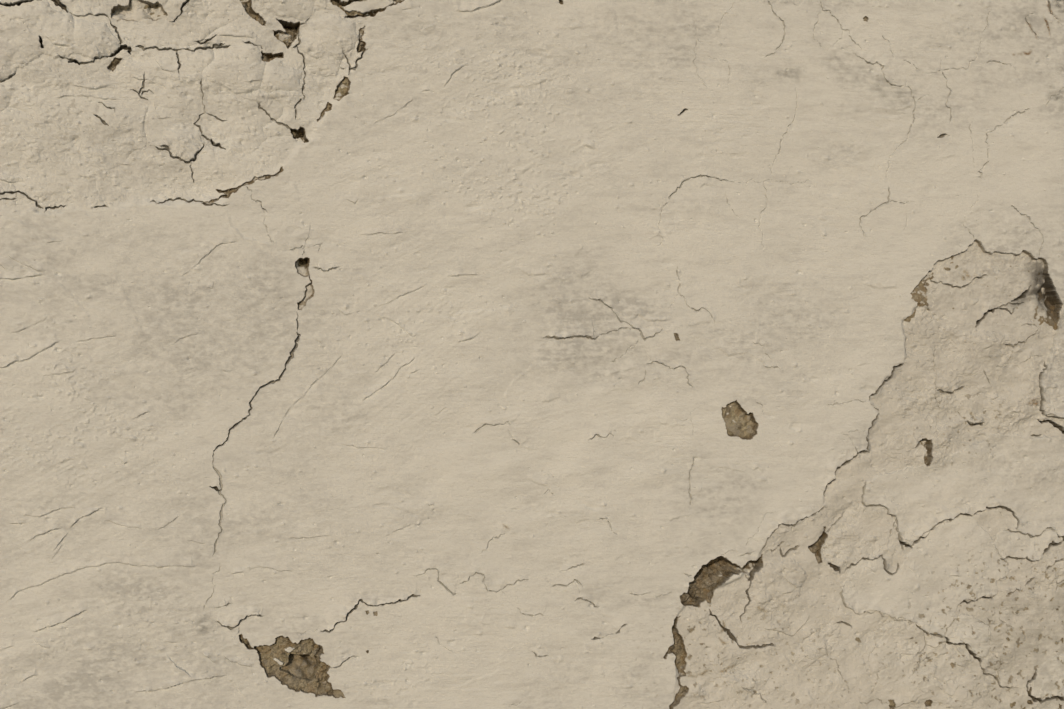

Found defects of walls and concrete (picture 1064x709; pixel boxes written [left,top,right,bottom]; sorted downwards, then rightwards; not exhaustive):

peeling [0,0,405,214]
crack [542,85,814,507]
crack [764,0,787,58]
crack [812,0,1064,240]
crack [1008,204,1045,259]
crack [203,311,301,636]
peeling [663,239,1064,709]
spalling [239,634,346,699]